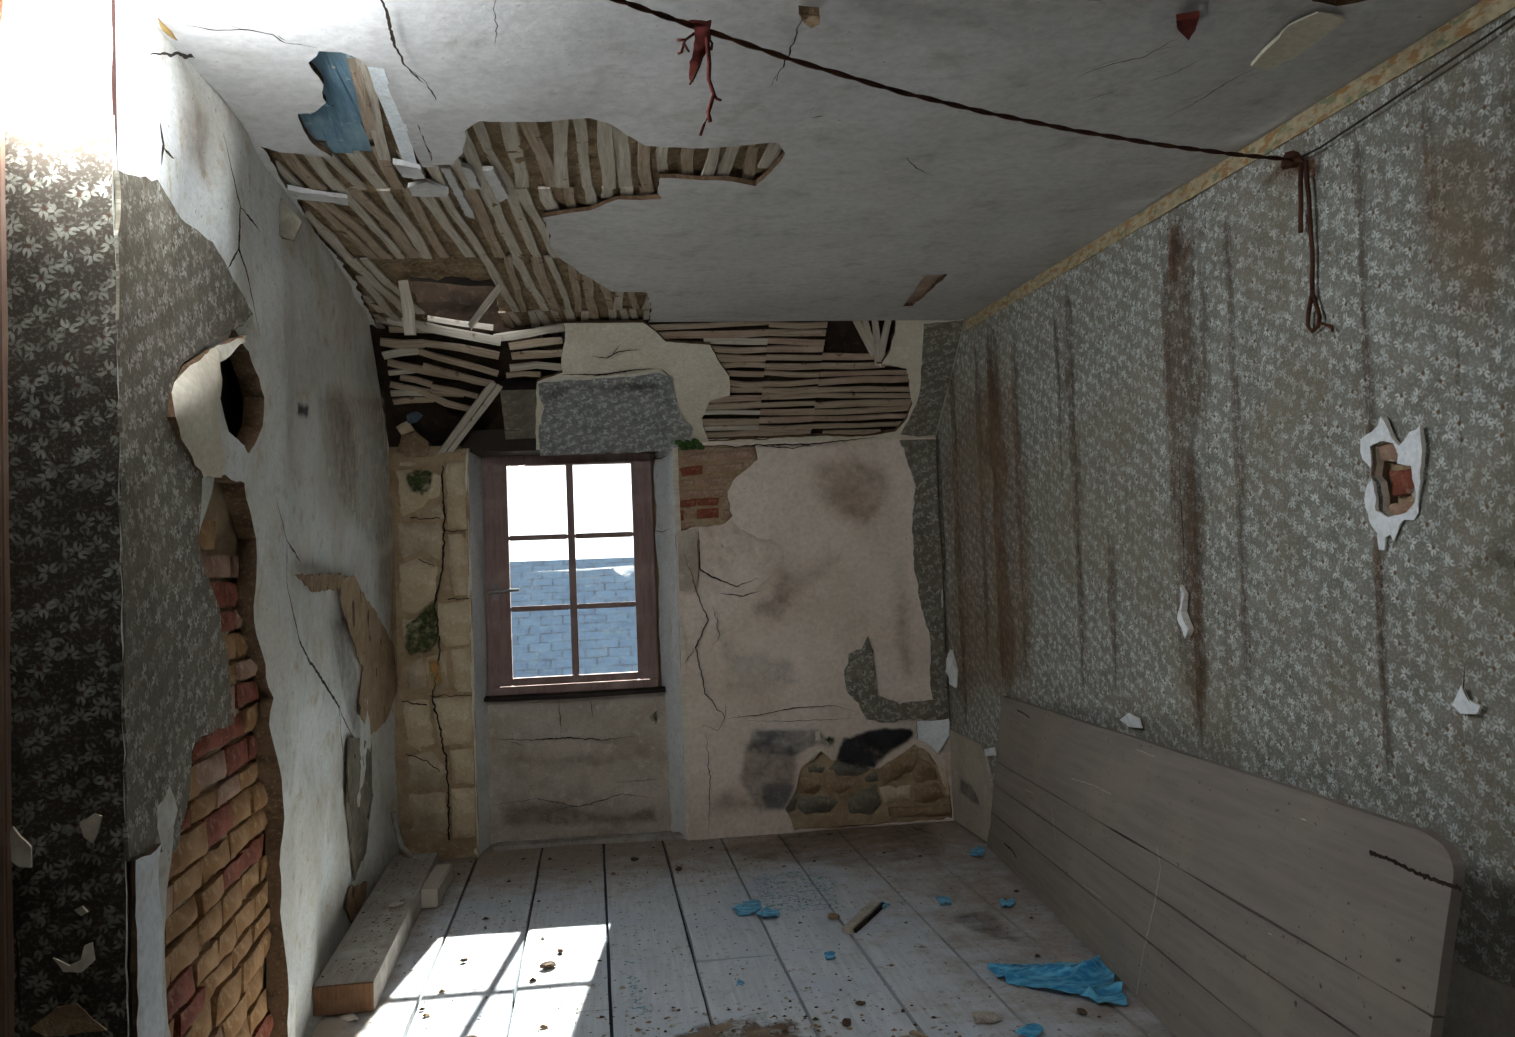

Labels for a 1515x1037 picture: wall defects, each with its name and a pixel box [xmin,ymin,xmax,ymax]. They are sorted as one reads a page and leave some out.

crack [380,0,436,99]
peeling [798,5,820,28]
peeling [1176,11,1200,40]
peeling [1251,11,1345,71]
spalling [268,51,912,923]
spalling [1360,416,1426,550]
crack [276,500,357,847]
crack [401,466,472,840]
crack [654,529,854,826]
spalling [130,482,274,1037]
leakage [749,728,913,768]
spalling [785,718,951,830]